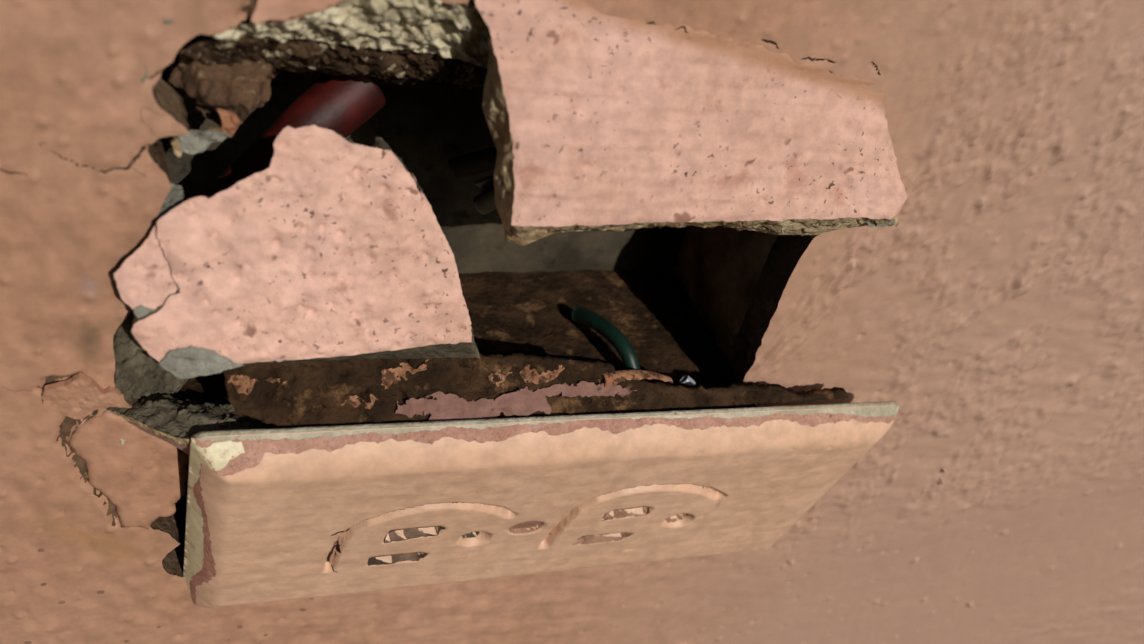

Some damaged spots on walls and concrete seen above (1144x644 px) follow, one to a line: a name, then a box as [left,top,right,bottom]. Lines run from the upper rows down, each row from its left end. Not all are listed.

spalling [213,0,490,68]
crack [39,106,173,178]
peeling [209,108,241,137]
spalling [154,183,184,225]
spalling [114,311,189,402]
rust [228,373,290,395]
rust [338,359,429,409]
peeling [395,381,637,422]
rust [487,364,565,389]